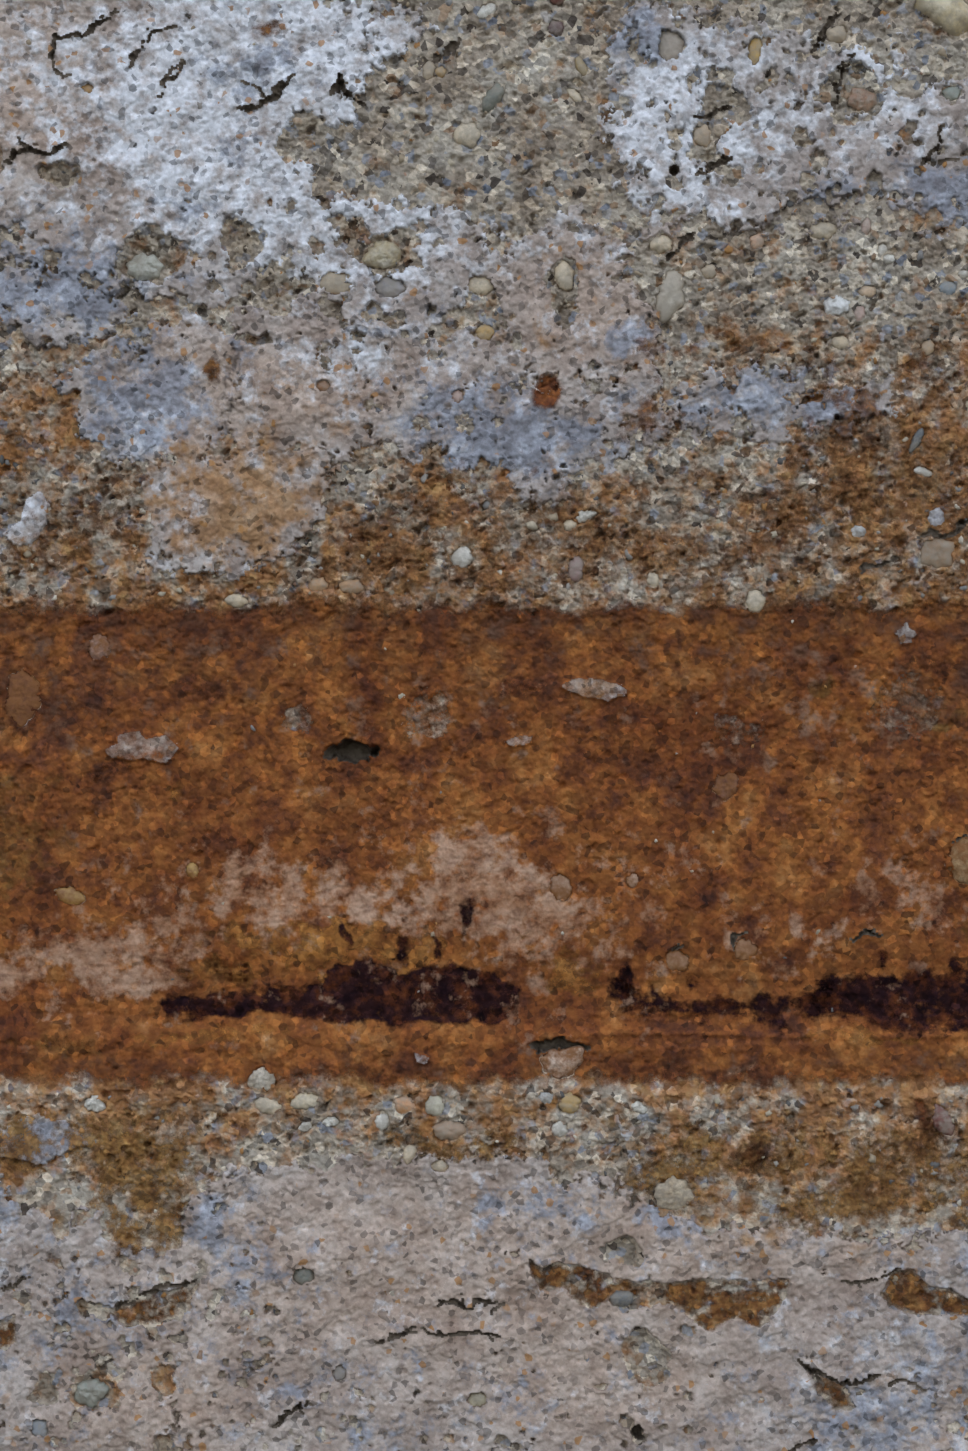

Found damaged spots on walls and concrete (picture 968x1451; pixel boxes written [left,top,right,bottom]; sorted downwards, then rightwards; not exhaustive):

crack [48,8,186,98]
crack [236,73,296,113]
crack [329,72,366,106]
crack [3,136,69,165]
corrosion [0,343,968,1090]
leakage [459,898,474,934]
leakage [160,921,521,1027]
leakage [607,950,968,1038]
corrosion [0,1110,200,1257]
corrosion [385,1123,522,1163]
corrosion [614,1100,968,1237]
peeling [0,1112,968,1451]